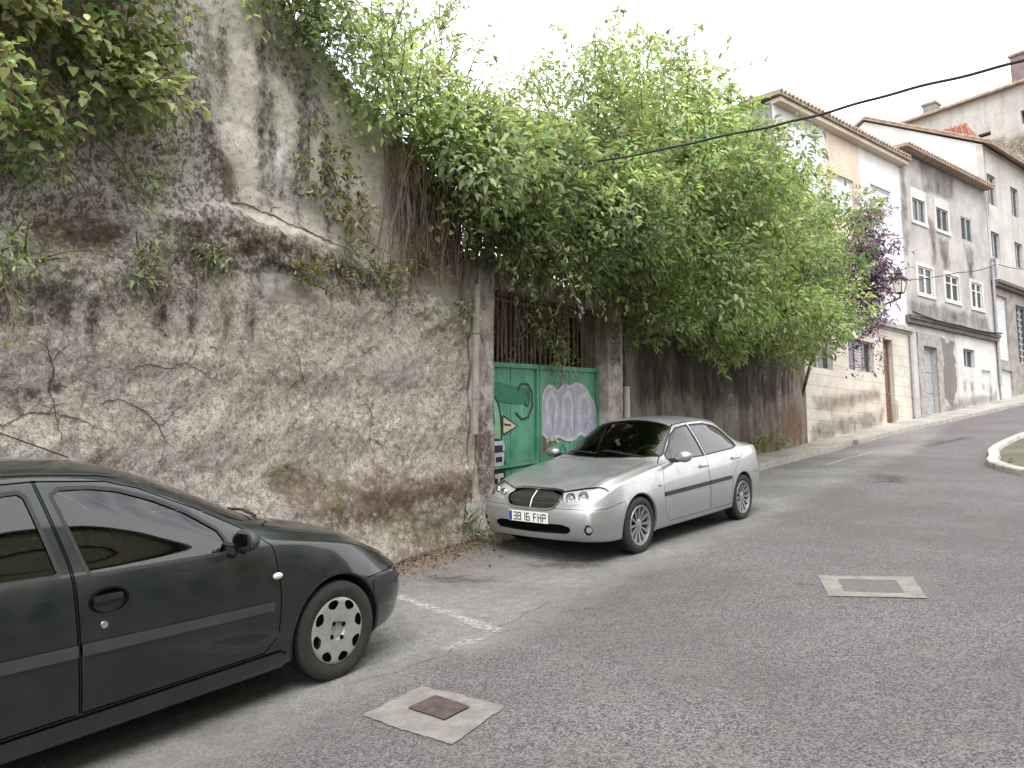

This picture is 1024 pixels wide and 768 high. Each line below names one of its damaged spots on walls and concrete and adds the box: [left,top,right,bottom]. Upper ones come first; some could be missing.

leakage [257,11,332,200]
crack [231,202,360,256]
leakage [147,279,172,339]
crack [0,342,188,465]
crack [127,346,224,381]
crack [285,344,312,410]
flaking render [941,337,958,407]